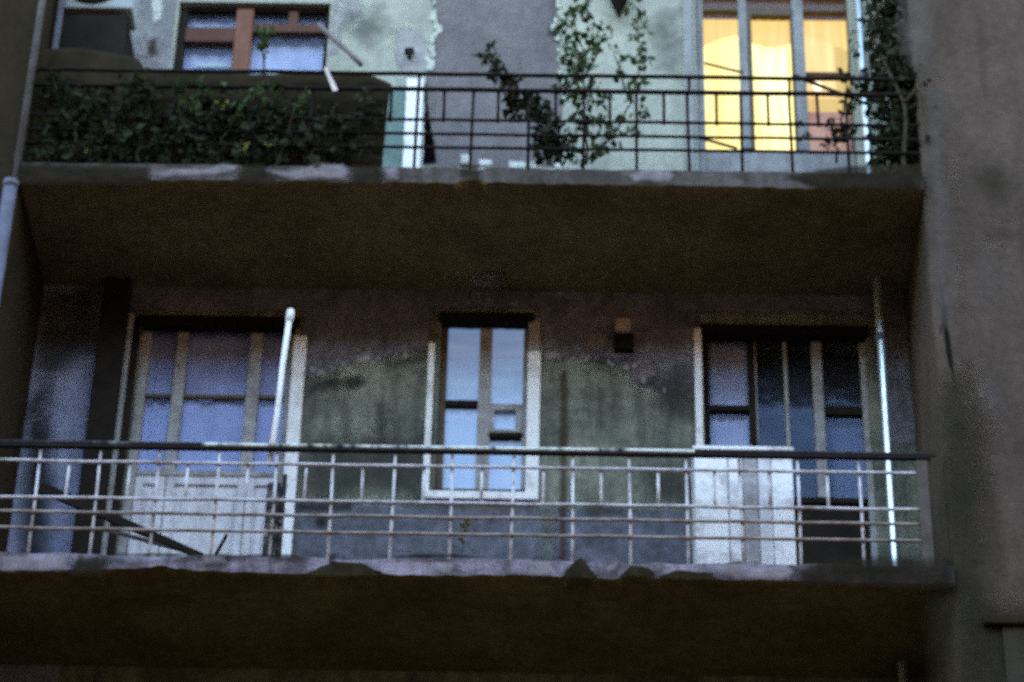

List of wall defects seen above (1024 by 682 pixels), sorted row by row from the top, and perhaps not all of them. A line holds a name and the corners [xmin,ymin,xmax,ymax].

peeling [396,0,568,175]
water stain [312,377,362,390]
peeling [295,499,791,580]